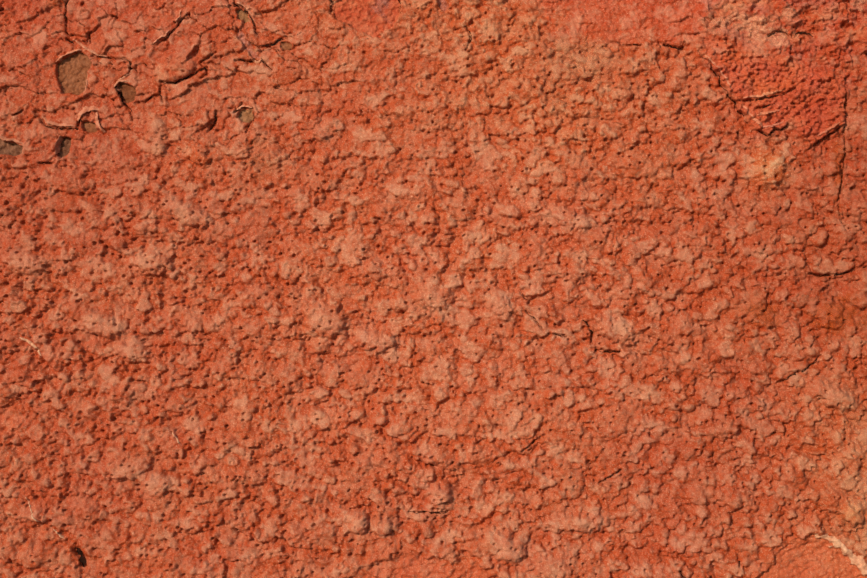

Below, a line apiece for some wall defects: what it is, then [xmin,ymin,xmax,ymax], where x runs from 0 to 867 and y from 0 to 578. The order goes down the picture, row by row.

crack [233,2,292,70]
peeling [55,49,92,95]
peeling [114,80,136,103]
crack [64,0,213,120]
crack [664,45,794,136]
crack [41,116,80,130]
peeling [77,105,106,133]
peeling [0,136,23,156]
peeling [54,135,71,158]
crack [816,112,846,230]
spalling [757,533,867,578]